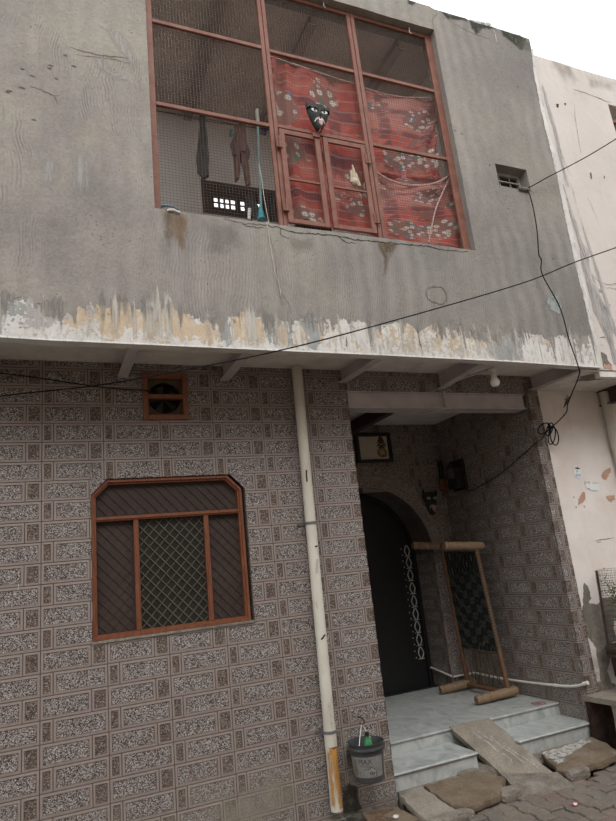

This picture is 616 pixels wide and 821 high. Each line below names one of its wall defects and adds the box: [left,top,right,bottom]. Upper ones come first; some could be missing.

peeling [0,286,613,381]
rust [328,746,343,808]